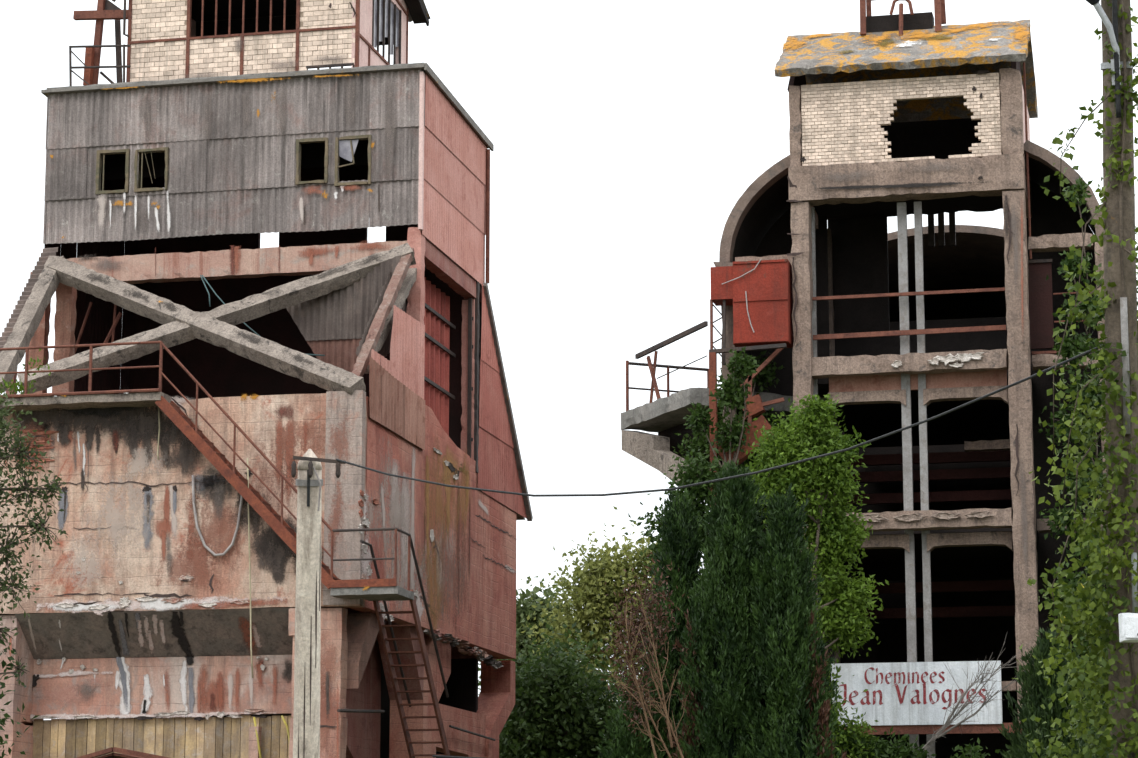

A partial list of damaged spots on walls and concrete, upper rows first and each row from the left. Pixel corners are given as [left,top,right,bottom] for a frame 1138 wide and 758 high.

efflorescence [97,192,170,231]
spalling [927,352,984,368]
damp [13,406,296,584]
rust [156,497,239,588]
peeling [56,581,131,610]
damp [50,602,165,715]
damp [140,598,286,717]